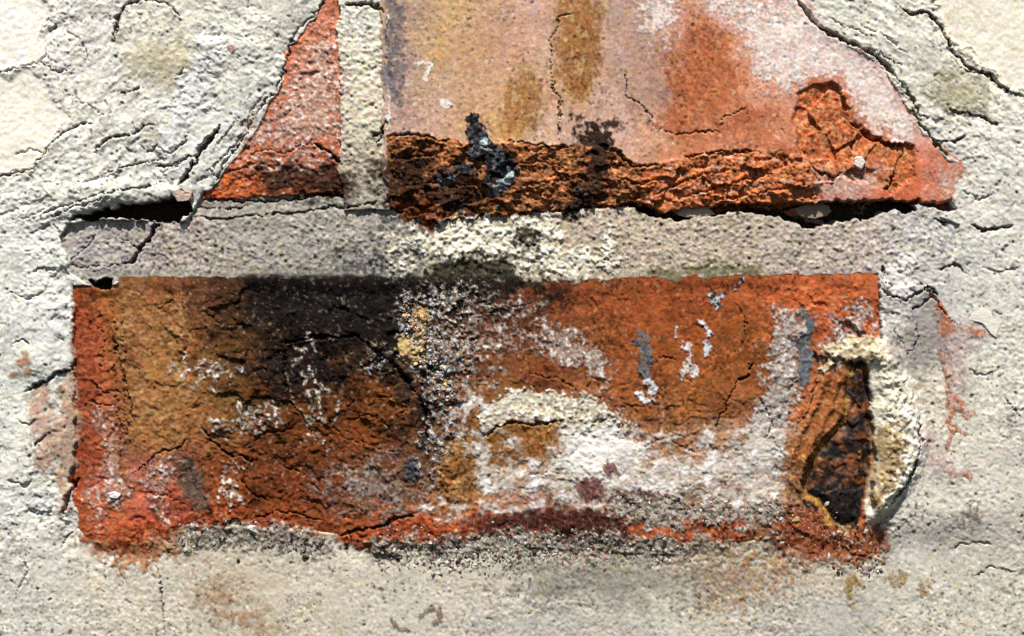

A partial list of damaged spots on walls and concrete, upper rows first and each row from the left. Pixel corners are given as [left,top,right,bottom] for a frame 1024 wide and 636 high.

damp [226,22,350,197]
spalling [383,81,916,225]
spalling [67,278,113,487]
damp [26,112,985,528]
spalling [149,519,341,560]
spalling [363,493,887,576]